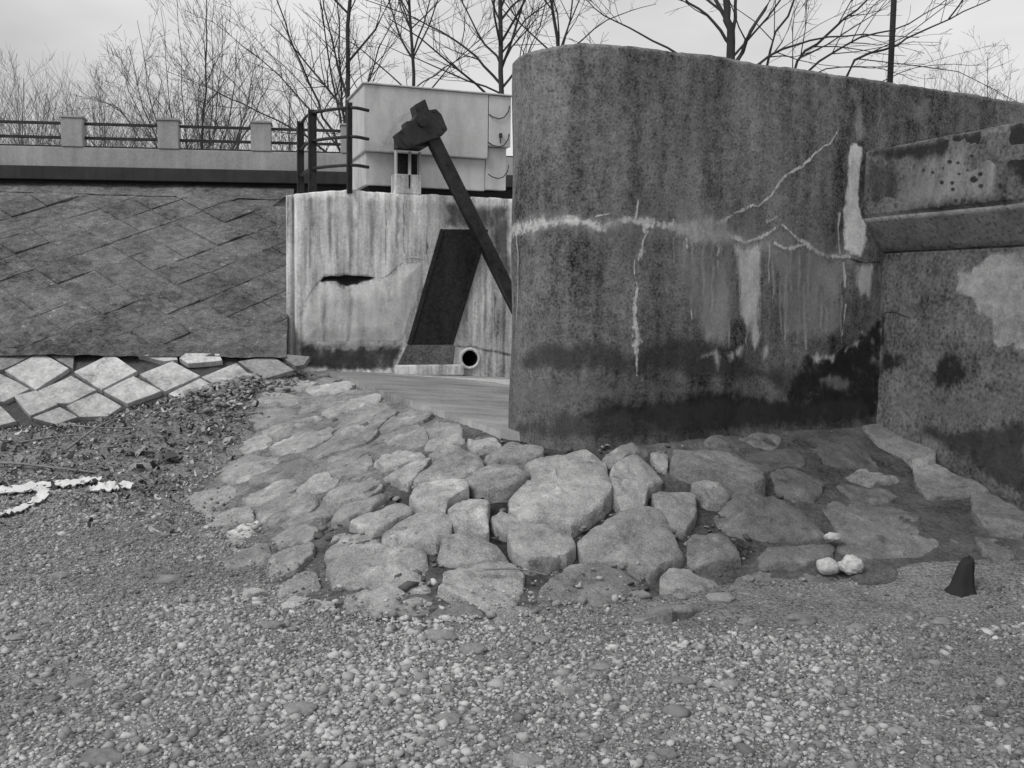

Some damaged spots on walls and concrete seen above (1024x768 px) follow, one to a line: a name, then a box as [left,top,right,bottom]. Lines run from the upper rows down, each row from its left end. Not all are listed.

crack [511,131,880,267]
water stain [609,112,1024,376]
crack [300,270,394,316]
flaking render [956,252,1024,349]
water stain [554,388,870,438]
water stain [927,355,964,387]